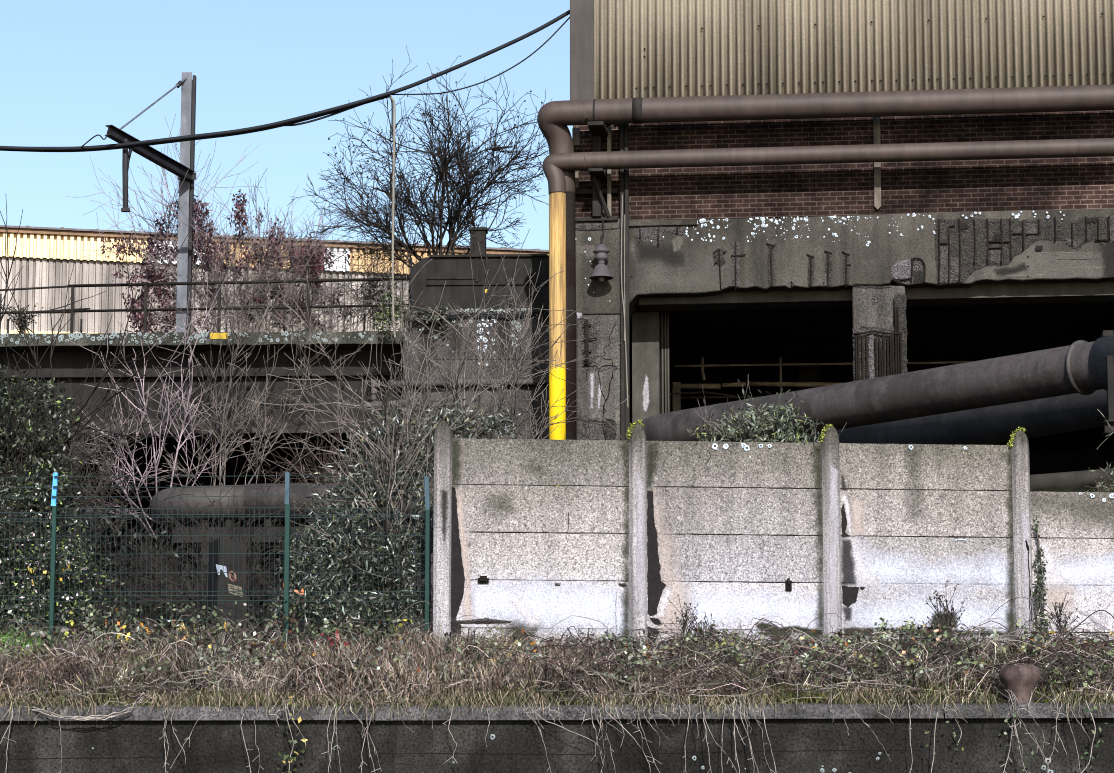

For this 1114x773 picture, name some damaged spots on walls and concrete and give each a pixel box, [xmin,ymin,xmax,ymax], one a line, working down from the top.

spalling [851,215,1114,382]
water stain [442,440,1114,649]